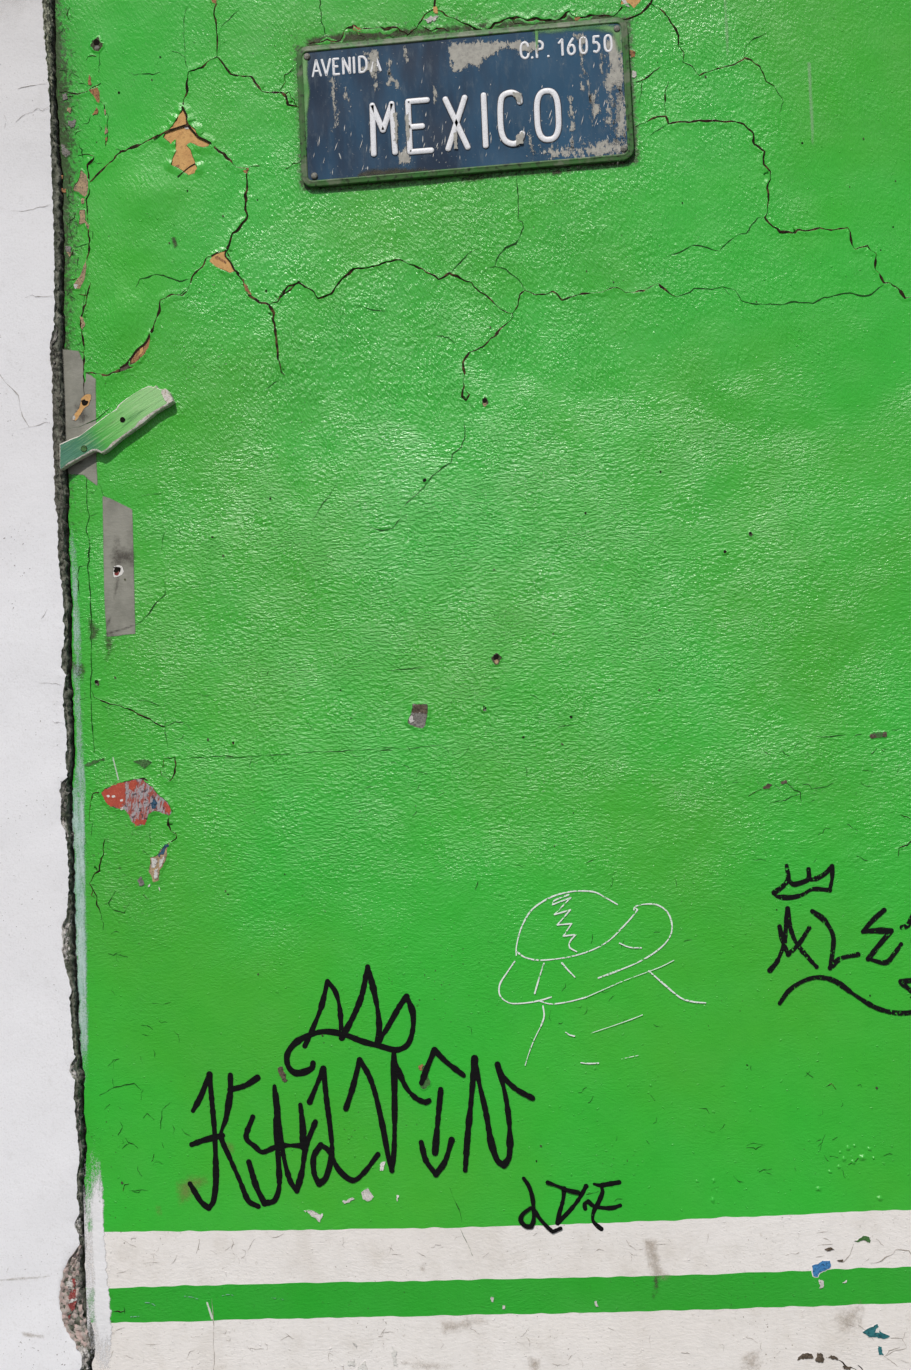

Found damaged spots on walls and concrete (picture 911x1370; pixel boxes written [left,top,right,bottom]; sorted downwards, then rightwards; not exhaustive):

peeling [617,0,645,11]
peeling [153,102,218,181]
crack [0,7,159,429]
peeling [207,247,253,295]
crack [133,0,911,531]
peeling [120,328,155,371]
spalling [42,0,135,1370]
spalling [404,701,432,732]
peeling [97,758,175,830]
peeling [138,840,172,890]
peeling [811,1247,843,1289]
peeling [796,1352,851,1370]